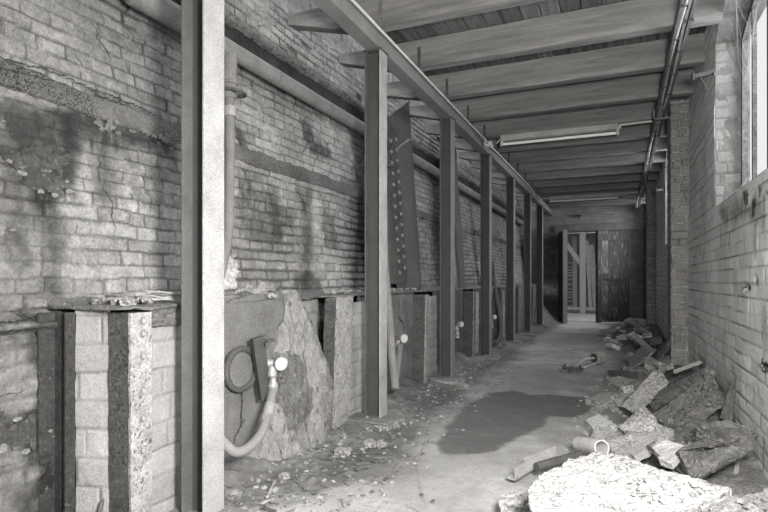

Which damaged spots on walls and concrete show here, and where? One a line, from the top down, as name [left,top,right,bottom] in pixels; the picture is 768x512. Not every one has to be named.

crack [0,53,174,123]
spalling [0,146,75,198]
leakage [0,105,173,194]
flaking render [93,119,181,151]
leakage [32,189,58,249]
spalling [0,411,36,454]